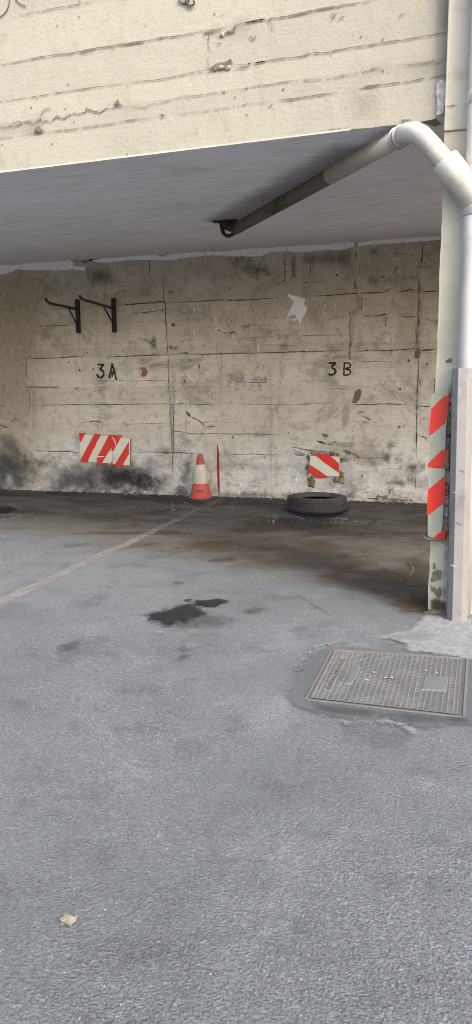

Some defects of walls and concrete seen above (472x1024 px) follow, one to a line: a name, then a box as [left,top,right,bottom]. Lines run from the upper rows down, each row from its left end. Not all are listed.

crack [0,30,446,138]
damp [0,454,26,484]
spalling [431,563,442,598]